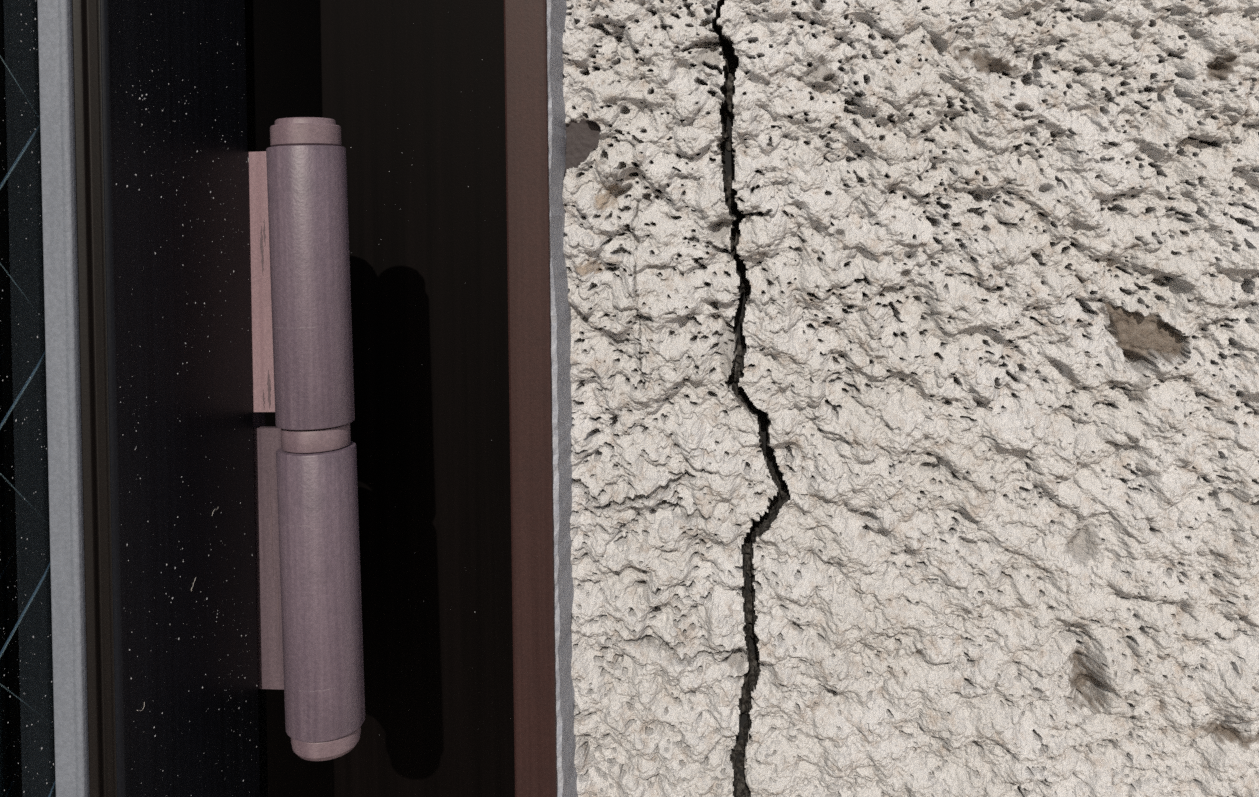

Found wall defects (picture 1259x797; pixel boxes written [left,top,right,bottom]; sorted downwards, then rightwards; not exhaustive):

crack [686,0,791,797]